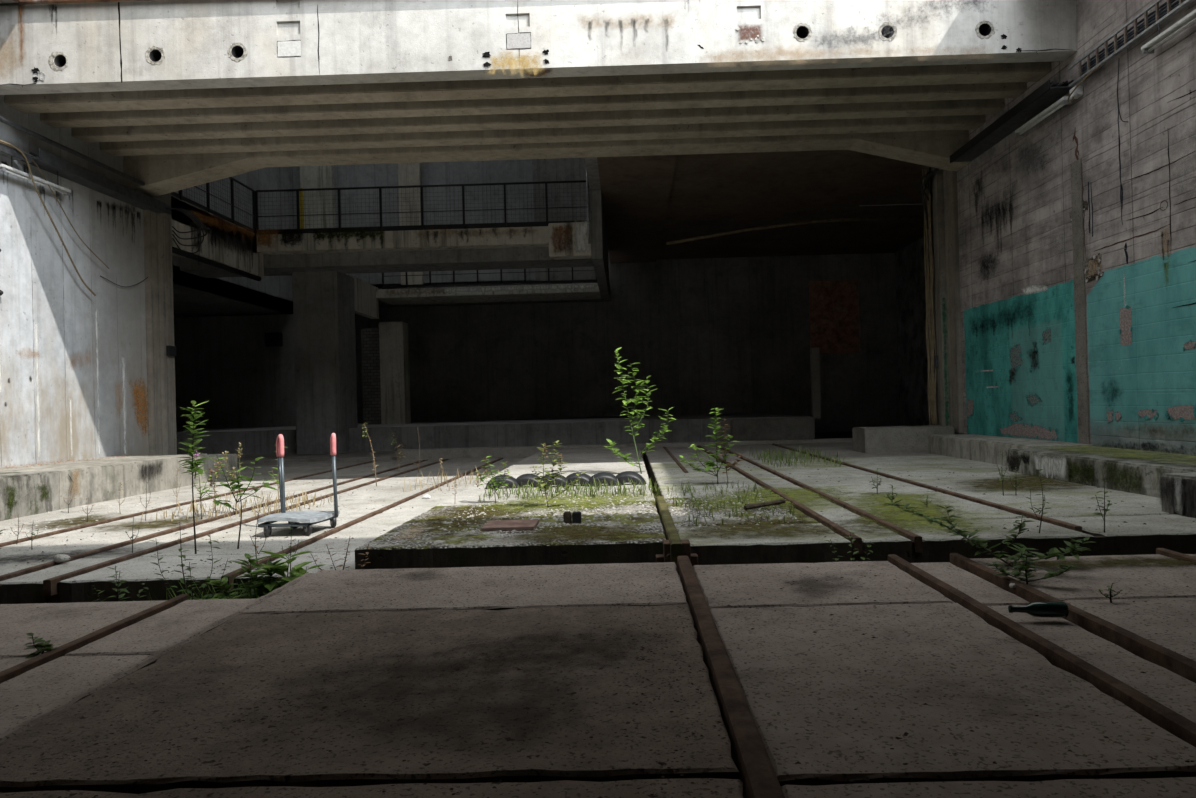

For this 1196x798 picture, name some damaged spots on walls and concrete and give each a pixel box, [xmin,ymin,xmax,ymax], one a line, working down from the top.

damp [973,172,1013,238]
peeling [1118,305,1132,346]
peeling [1000,393,1058,441]
peeling [1138,405,1196,422]